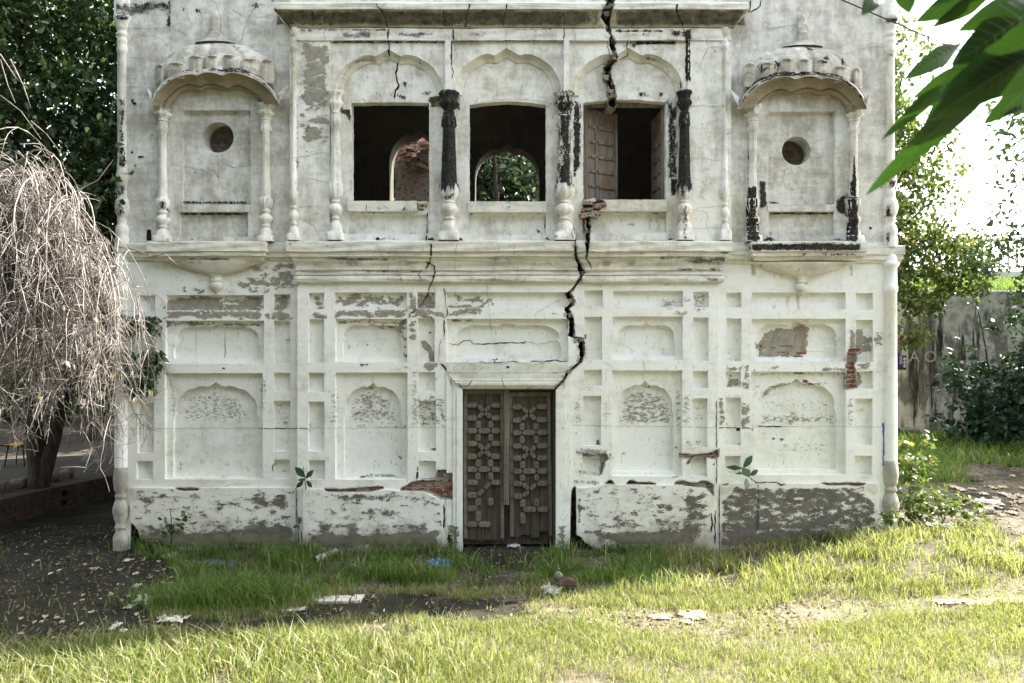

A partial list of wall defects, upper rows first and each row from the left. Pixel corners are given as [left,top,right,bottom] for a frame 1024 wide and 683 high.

crack [368,3,400,99]
crack [598,0,628,115]
water stain [442,94,460,199]
water stain [557,94,581,186]
water stain [639,92,688,240]
water stain [746,152,861,256]
peeling [162,263,299,328]
crack [366,203,624,390]
flaking render [719,326,883,444]
peeling [130,487,294,549]
flaking render [307,448,453,547]
peeling [570,440,875,547]